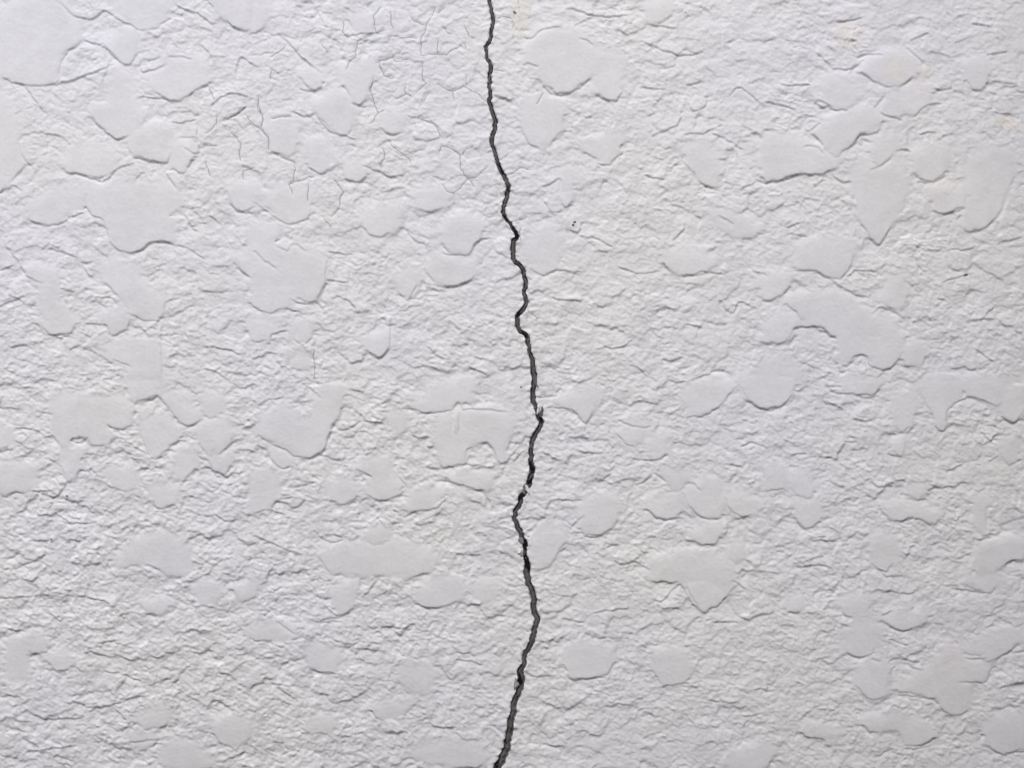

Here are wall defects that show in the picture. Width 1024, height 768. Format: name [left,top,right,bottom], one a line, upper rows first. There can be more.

crack [309,0,558,768]